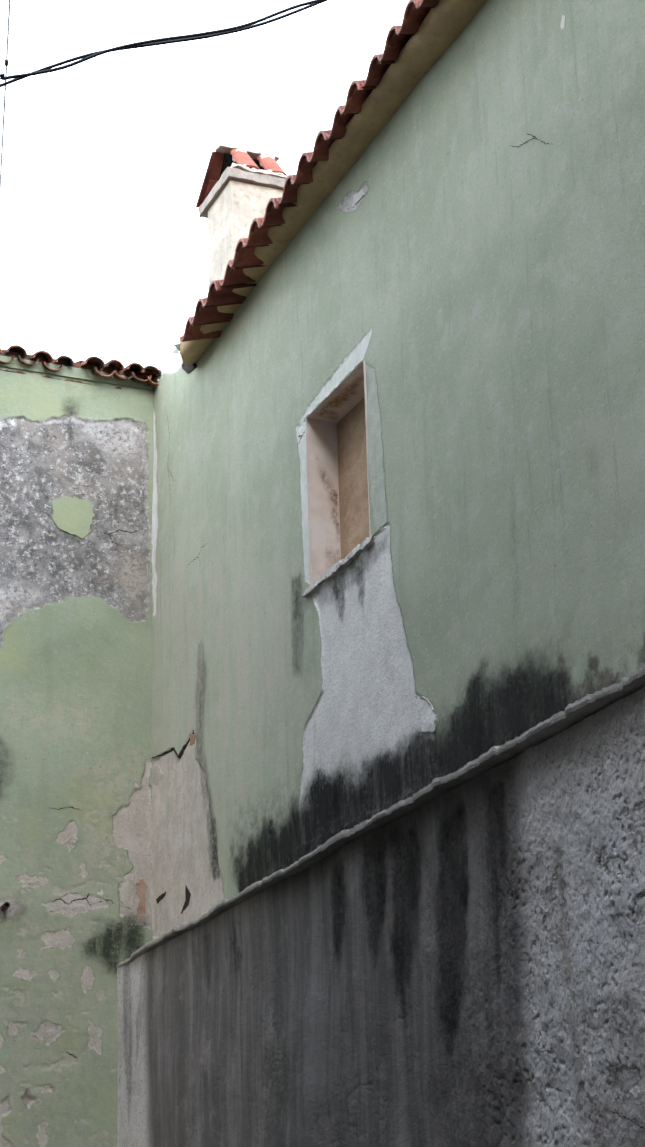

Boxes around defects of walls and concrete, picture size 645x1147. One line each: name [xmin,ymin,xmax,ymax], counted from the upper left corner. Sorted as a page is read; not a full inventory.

flaking render [0,410,158,645]
flaking render [0,897,22,918]
spalling [12,948,60,982]
flaking render [40,730,224,950]
leakage [232,656,622,893]
spalling [0,1084,55,1147]